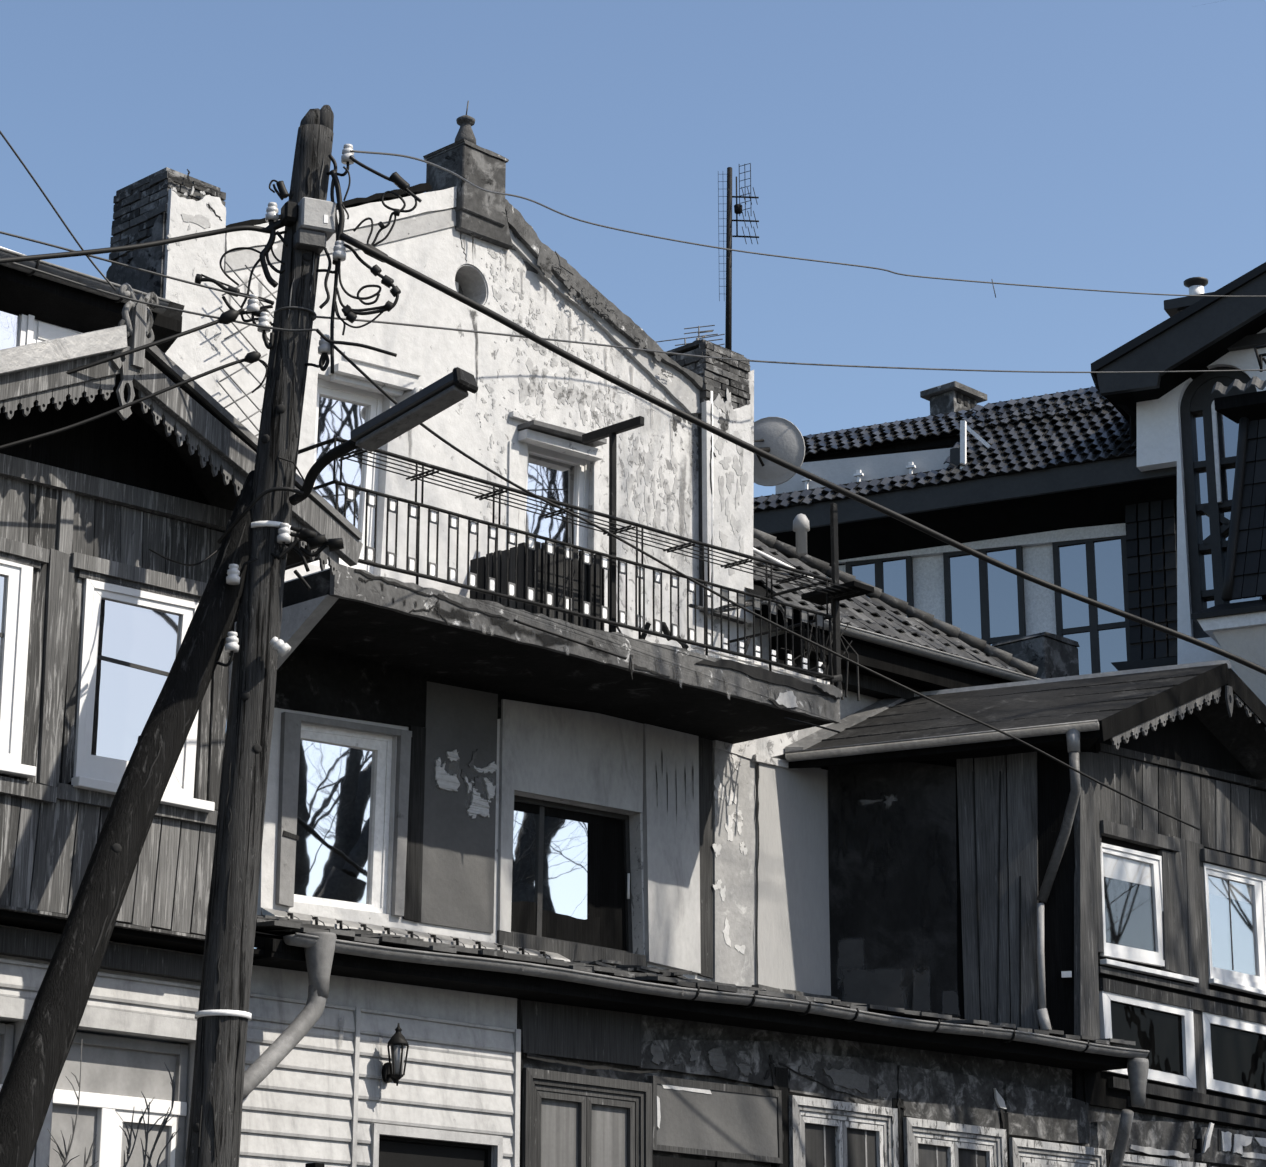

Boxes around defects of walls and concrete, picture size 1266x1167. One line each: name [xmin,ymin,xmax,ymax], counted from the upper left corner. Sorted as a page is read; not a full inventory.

spalling [166,186,212,251]
peeling [475,231,699,605]
spalling [714,388,748,575]
peeling [434,750,497,819]
peeling [712,773,748,857]
peeling [712,879,726,903]
peeling [722,917,746,954]